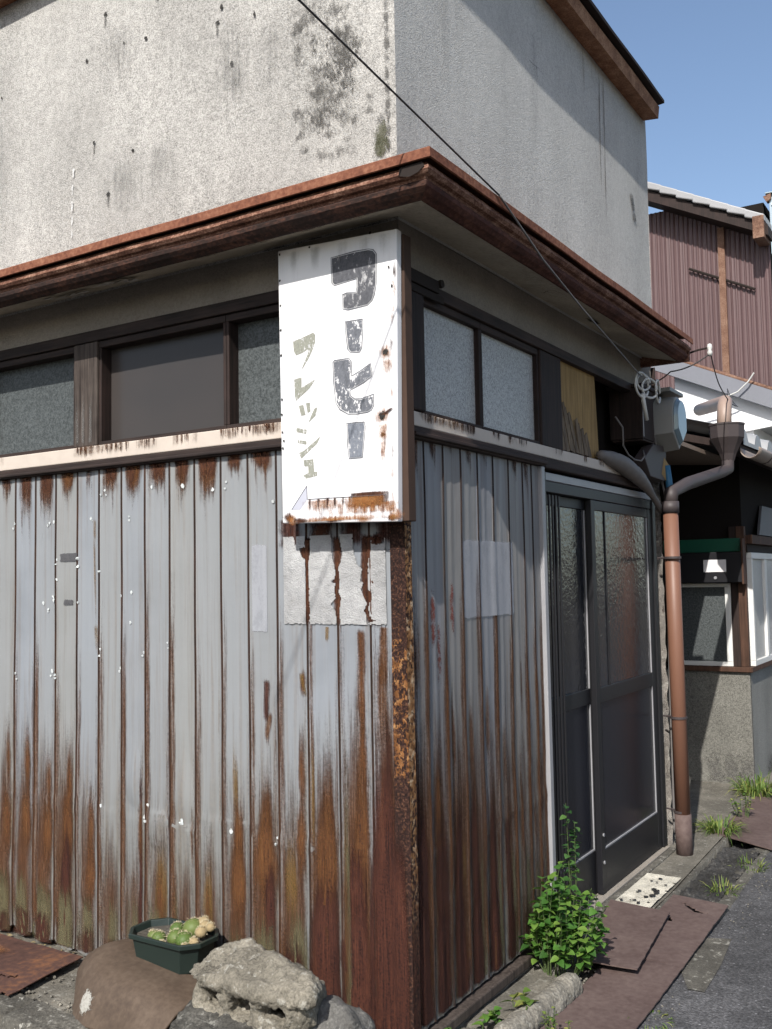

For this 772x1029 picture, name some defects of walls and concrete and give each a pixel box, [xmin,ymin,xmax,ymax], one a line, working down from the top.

leakage [292,1,390,159]
rust [220,422,278,436]
rust [2,473,73,526]
rust [103,451,271,499]
rust [0,491,550,1029]